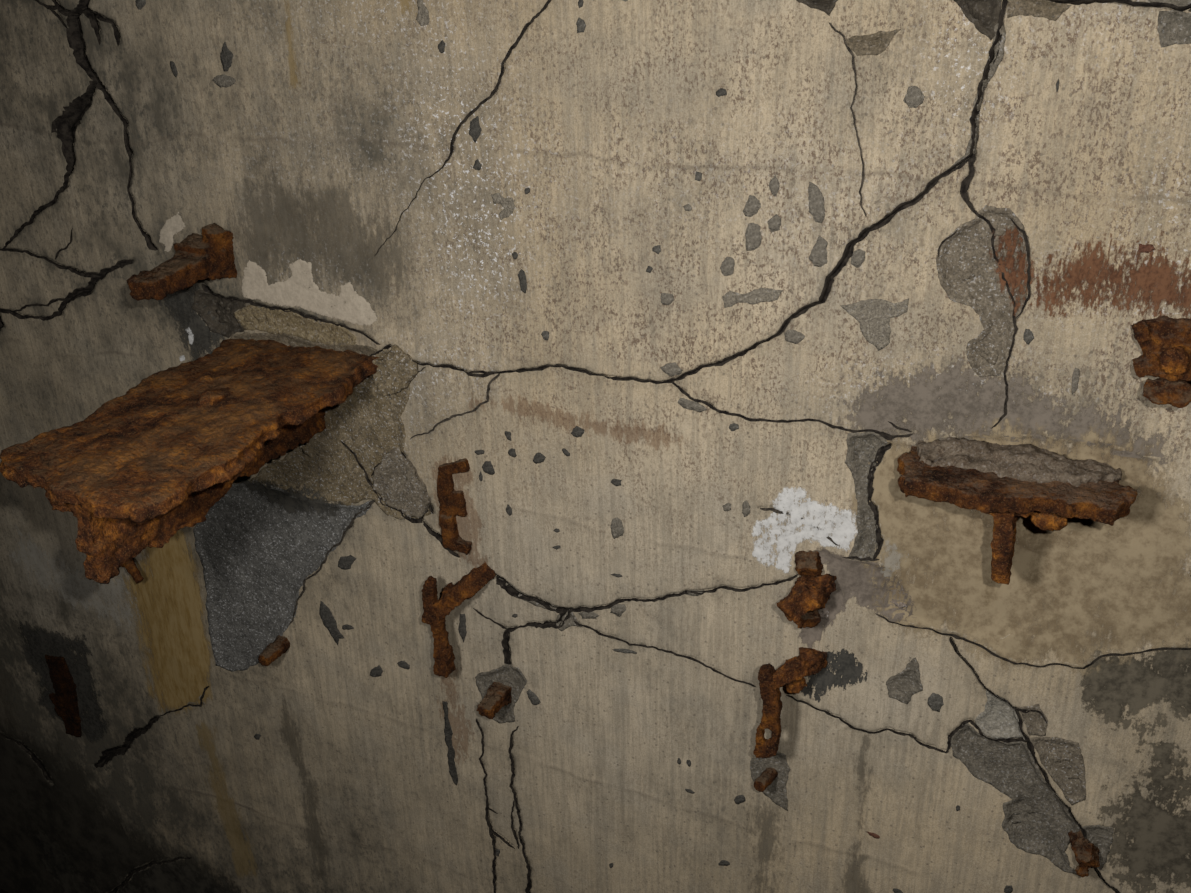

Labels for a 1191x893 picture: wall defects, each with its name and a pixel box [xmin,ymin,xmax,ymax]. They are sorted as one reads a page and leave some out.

crack [0,0,158,329]
peeling [191,259,390,357]
crack [202,0,1031,625]
spalling [936,205,1034,377]
rust [989,227,1191,320]
spalling [193,375,433,672]
rust [437,458,472,555]
water stain [752,487,858,573]
crack [473,574,798,687]
crack [786,614,1191,839]
spalling [949,690,1114,876]
water stain [1080,639,1191,893]